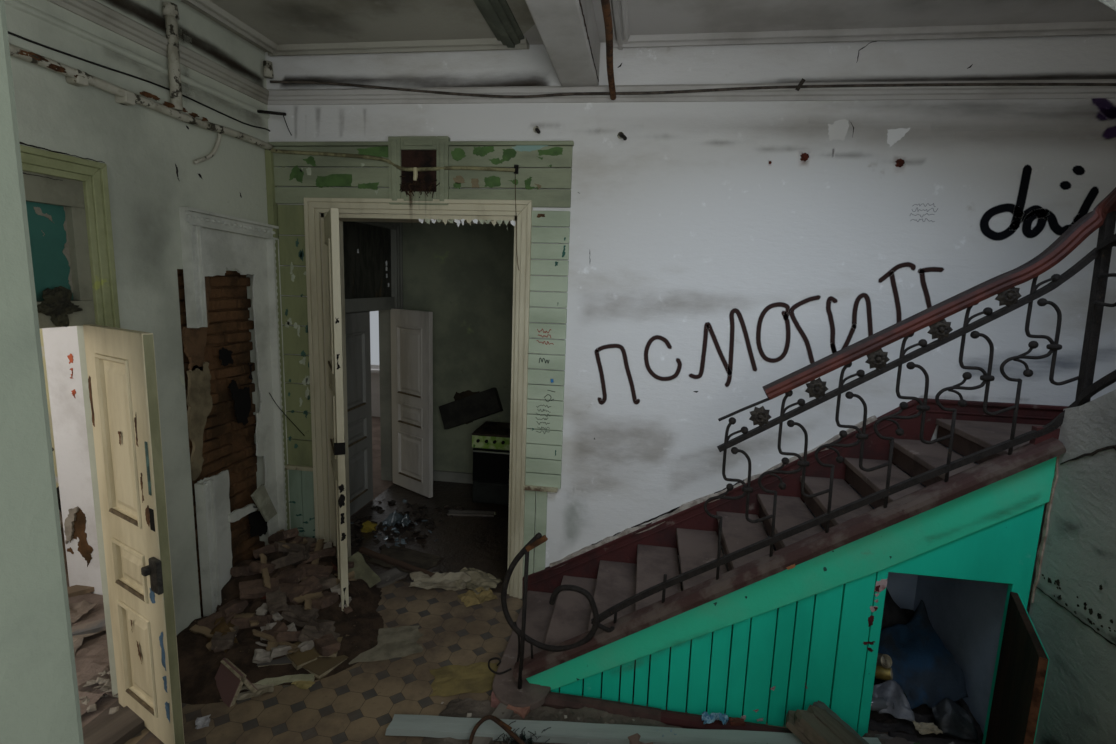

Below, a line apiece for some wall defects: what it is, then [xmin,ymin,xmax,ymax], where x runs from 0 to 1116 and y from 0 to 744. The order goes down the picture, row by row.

peeling [18,49,85,79]
peeling [140,91,208,130]
peeling [289,146,388,194]
peeling [451,145,563,190]
flaking render [177,269,268,617]
crack [1060,445,1116,465]